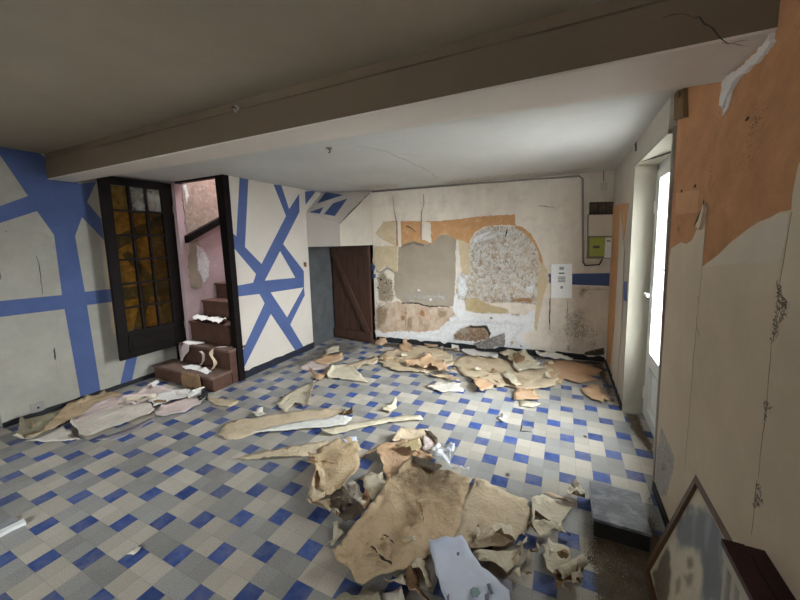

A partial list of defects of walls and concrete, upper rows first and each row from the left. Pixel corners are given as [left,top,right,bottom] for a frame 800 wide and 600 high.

crack [663,14,745,46]
spalling [719,33,776,116]
flaking render [374,226,540,333]
spalling [454,317,505,349]
leakage [552,285,606,356]
leakage [770,213,792,340]